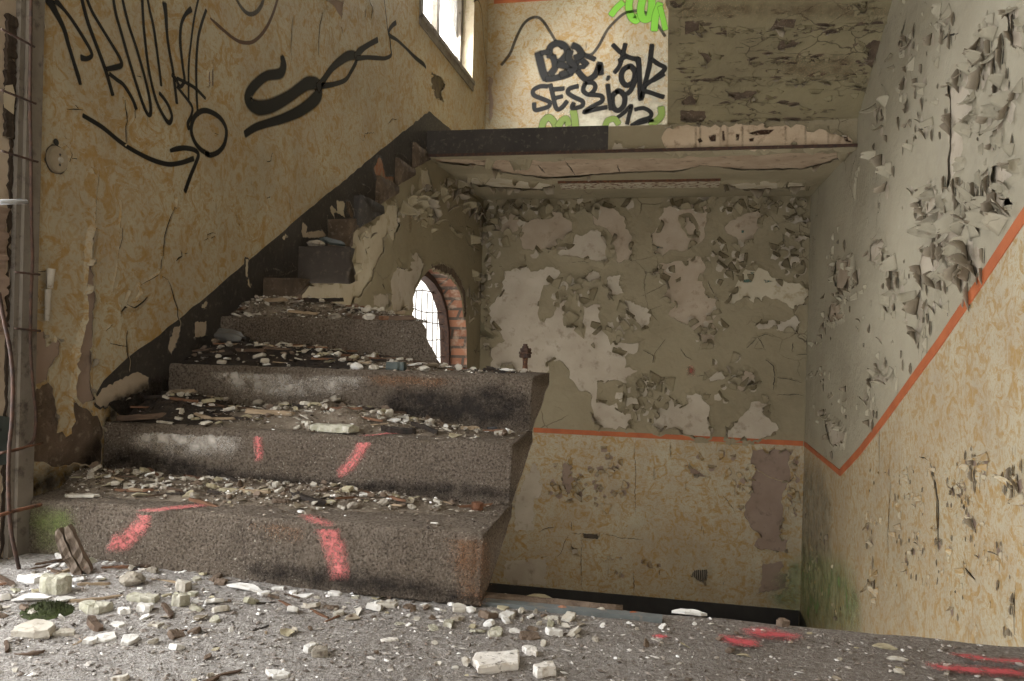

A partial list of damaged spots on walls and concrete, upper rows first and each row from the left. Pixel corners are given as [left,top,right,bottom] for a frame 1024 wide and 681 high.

spalling [0,0,149,529]
spalling [167,324,181,355]
peeling [301,0,1024,558]
peeling [859,447,1024,621]
peeling [1002,593,1015,638]